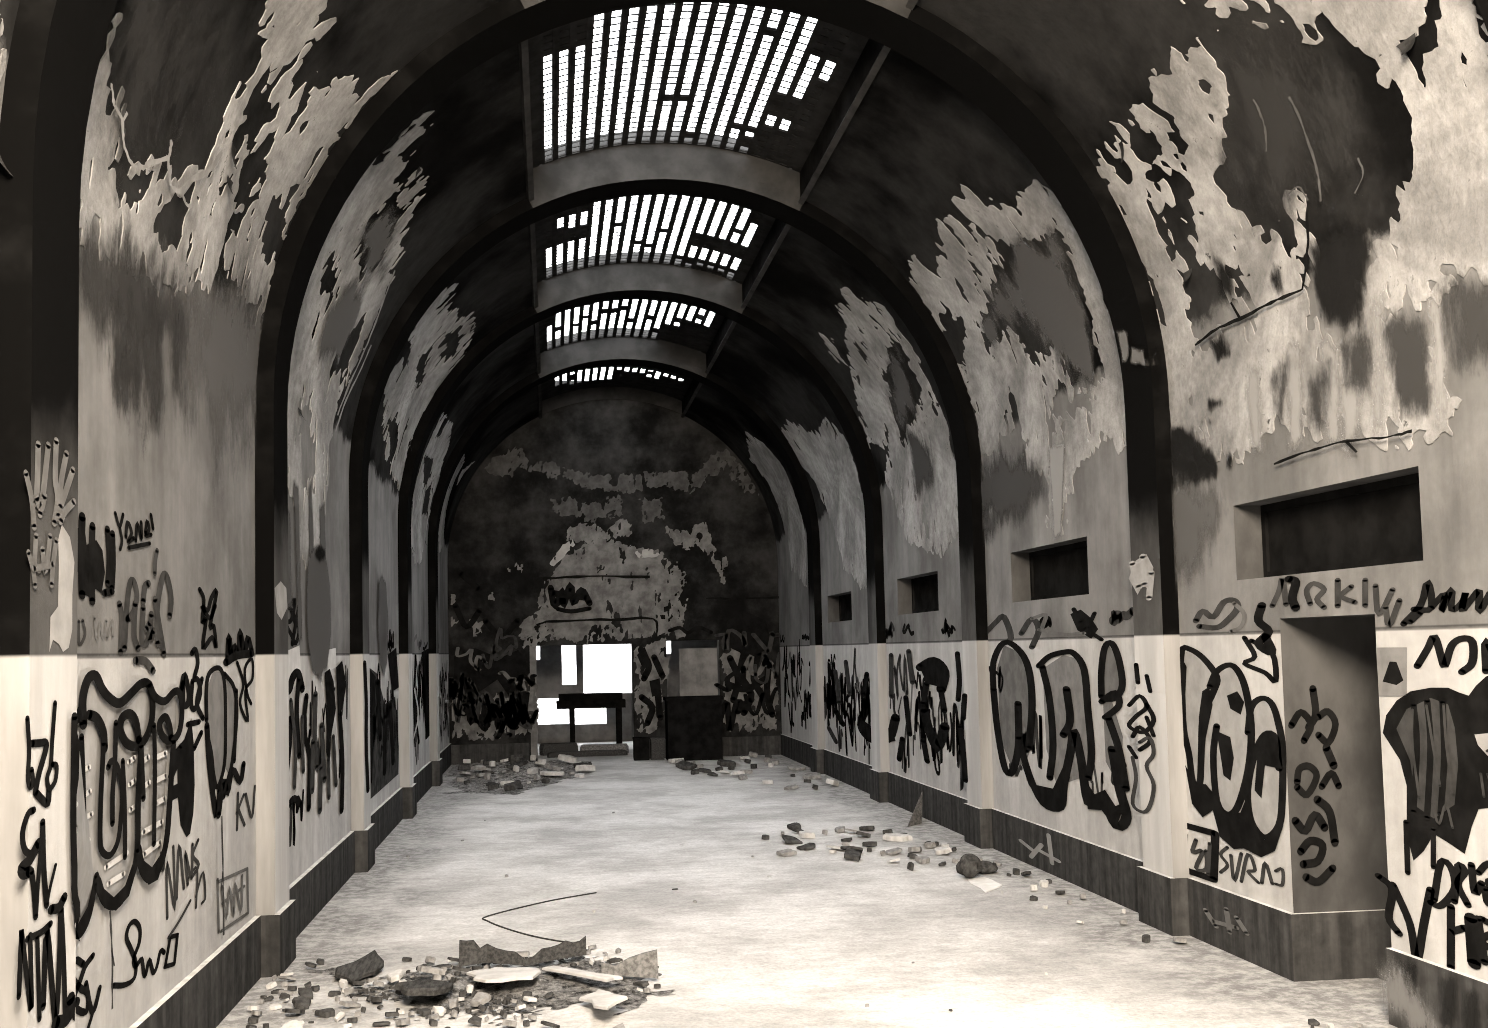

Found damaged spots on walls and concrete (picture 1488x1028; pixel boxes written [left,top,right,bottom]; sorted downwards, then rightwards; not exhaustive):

water stain [79,226,268,474]
peeling [79,0,398,314]
peeling [287,110,434,570]
peeling [381,283,867,741]
peeling [818,287,959,558]
peeling [908,179,1126,536]
water stain [1210,334,1230,363]
water stain [1214,258,1233,296]
crack [1195,96,1364,346]
peeling [1096,0,1488,466]
water stain [1247,222,1488,452]